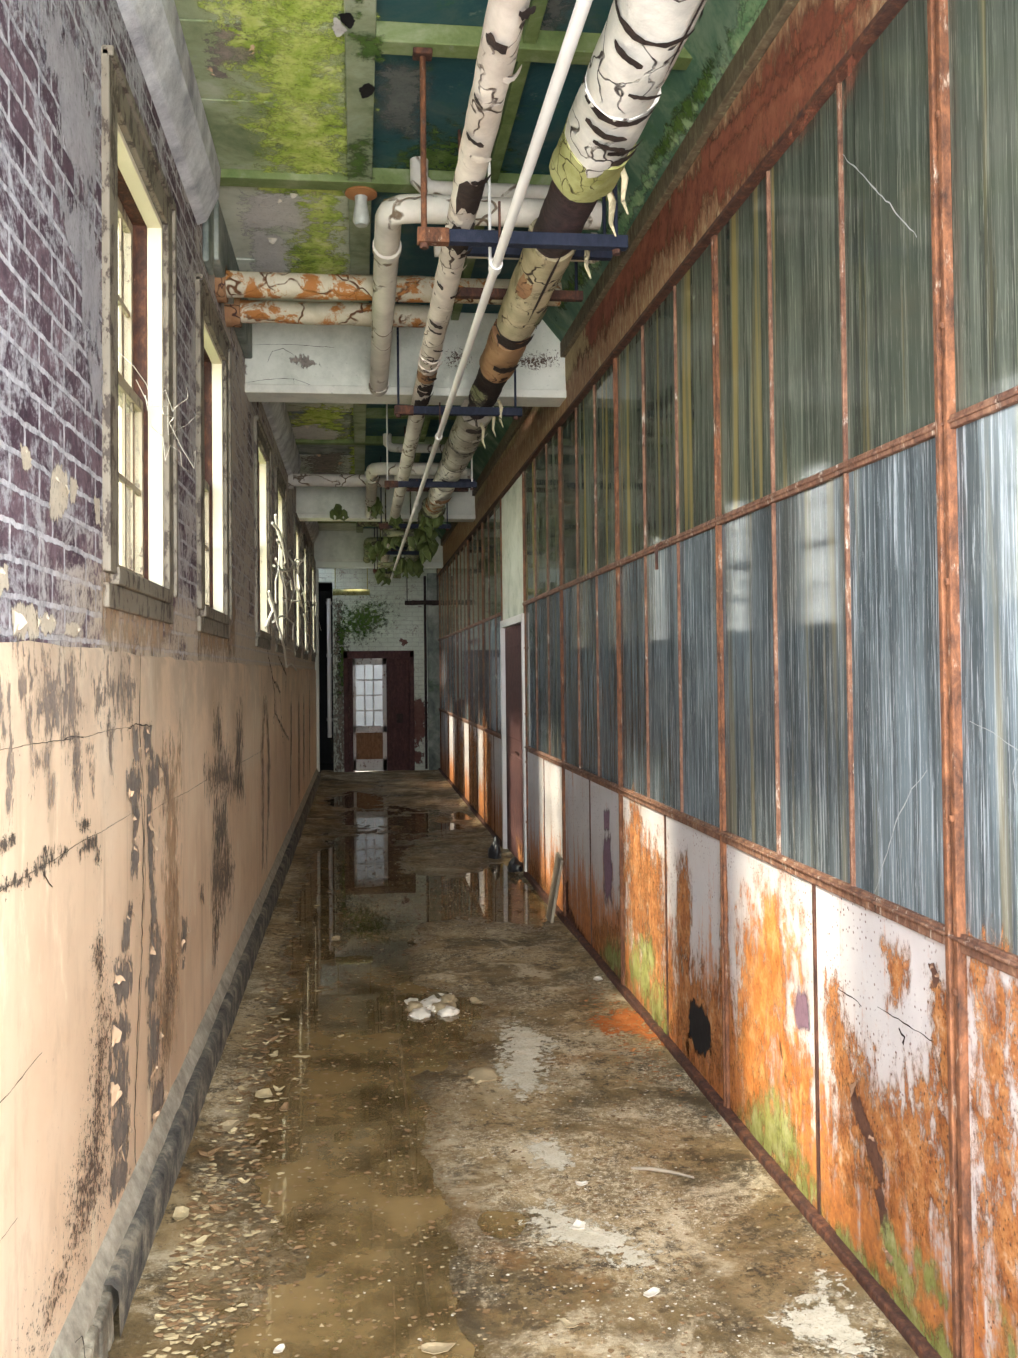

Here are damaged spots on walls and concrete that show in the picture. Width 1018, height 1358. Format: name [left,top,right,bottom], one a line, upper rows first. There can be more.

water stain [294,248,347,274]
water stain [251,0,428,138]
corrosion [573,0,872,362]
peeling [20,442,32,471]
peeling [0,563,81,641]
peeling [49,463,78,526]
water stain [0,607,171,902]
water stain [159,744,181,1060]
water stain [200,704,245,966]
corrosion [517,838,583,936]
corrosion [579,784,951,1249]
corrosion [965,957,1018,1338]